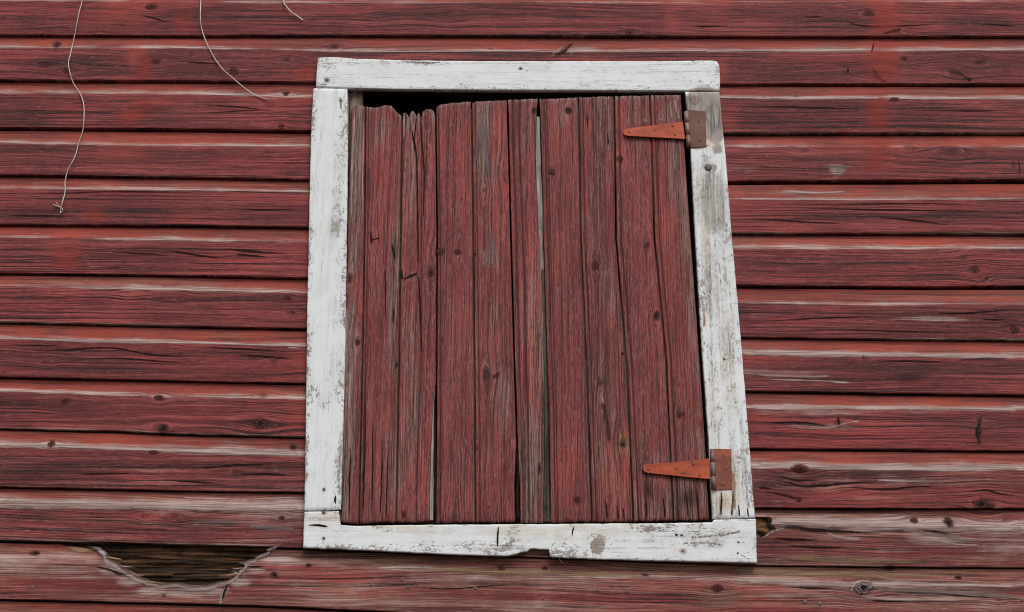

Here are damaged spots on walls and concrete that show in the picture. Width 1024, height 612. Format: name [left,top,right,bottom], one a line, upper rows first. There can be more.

crack [370,117,425,347]